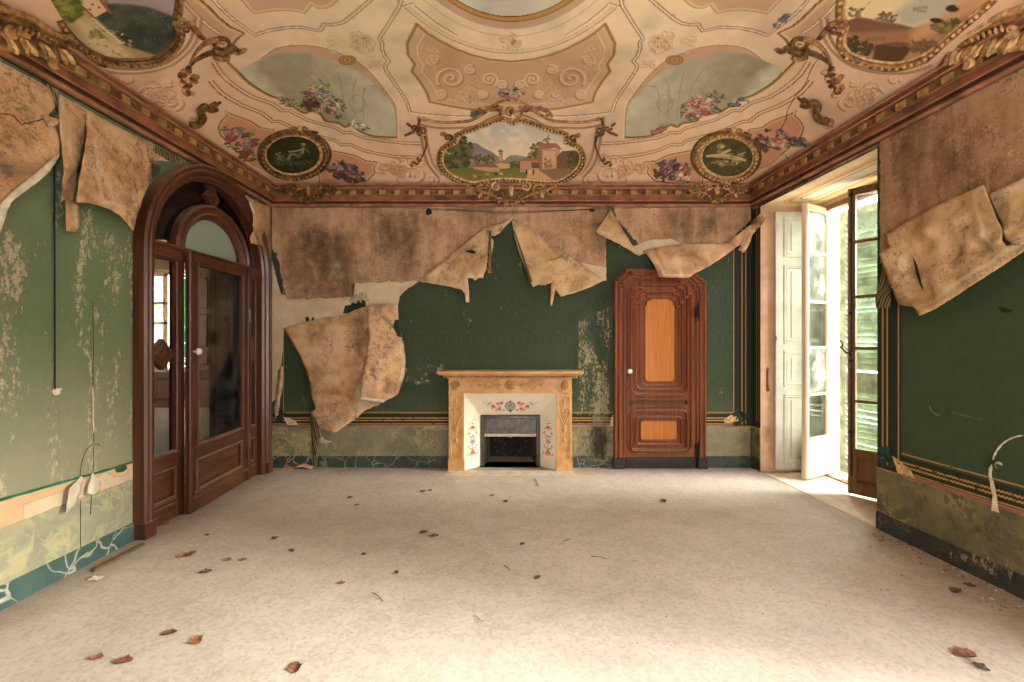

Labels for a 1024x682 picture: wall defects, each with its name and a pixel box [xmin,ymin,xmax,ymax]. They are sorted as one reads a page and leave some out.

flaking render [265,68,1024,417]